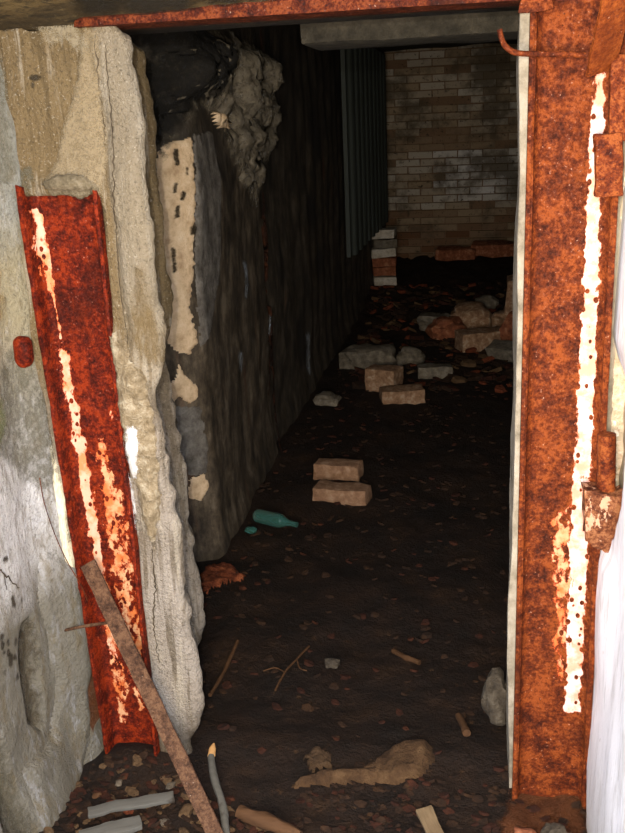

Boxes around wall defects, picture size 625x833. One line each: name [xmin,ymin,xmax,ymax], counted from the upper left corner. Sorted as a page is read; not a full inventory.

spalling [156,29,284,355]
peeling [171,364,209,501]
crack [0,569,19,590]
corrosion [88,674,100,731]